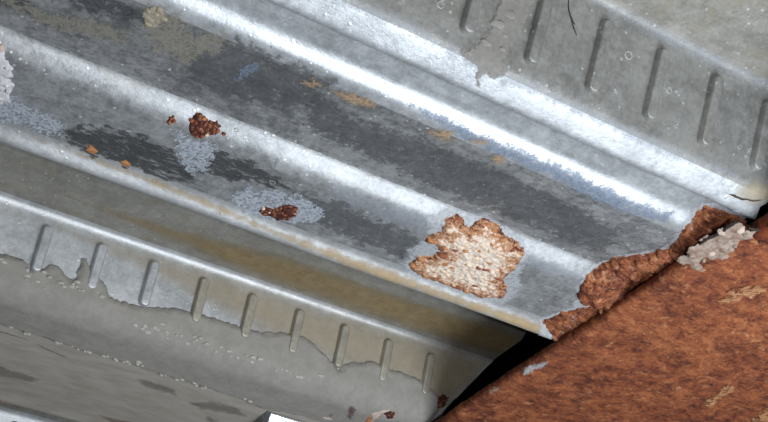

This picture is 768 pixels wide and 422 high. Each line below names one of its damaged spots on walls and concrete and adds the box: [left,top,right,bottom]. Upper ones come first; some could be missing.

rust [167,112,239,179]
damp [0,0,624,260]
damp [407,103,674,222]
rust [202,180,325,234]
rust [625,202,750,257]
peeling [656,210,749,270]
rust [289,209,608,339]
peeling [577,269,603,314]
rust [718,286,766,303]
damp [0,254,440,422]
rust [437,394,449,408]
rust [706,386,733,407]